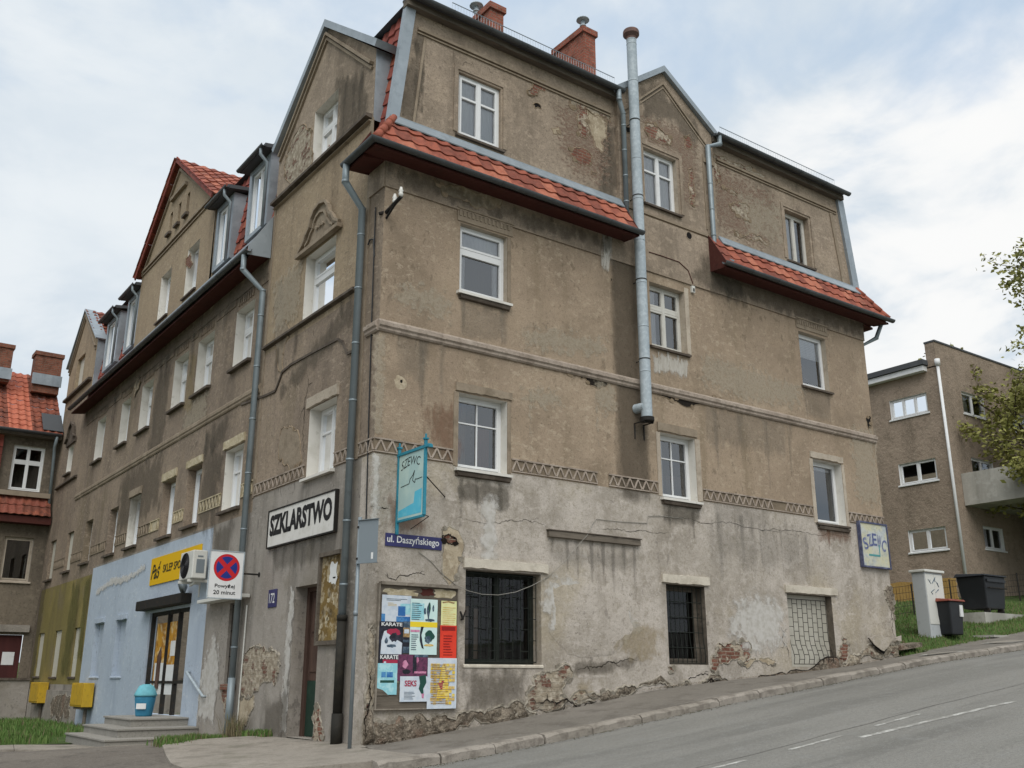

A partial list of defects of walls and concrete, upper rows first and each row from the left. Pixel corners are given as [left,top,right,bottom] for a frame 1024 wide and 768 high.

flaking render [527,80,547,110]
flaking render [568,98,611,166]
flaking render [441,525,465,585]
flaking render [220,644,281,727]
crack [578,658,637,670]
flaking render [361,623,901,746]